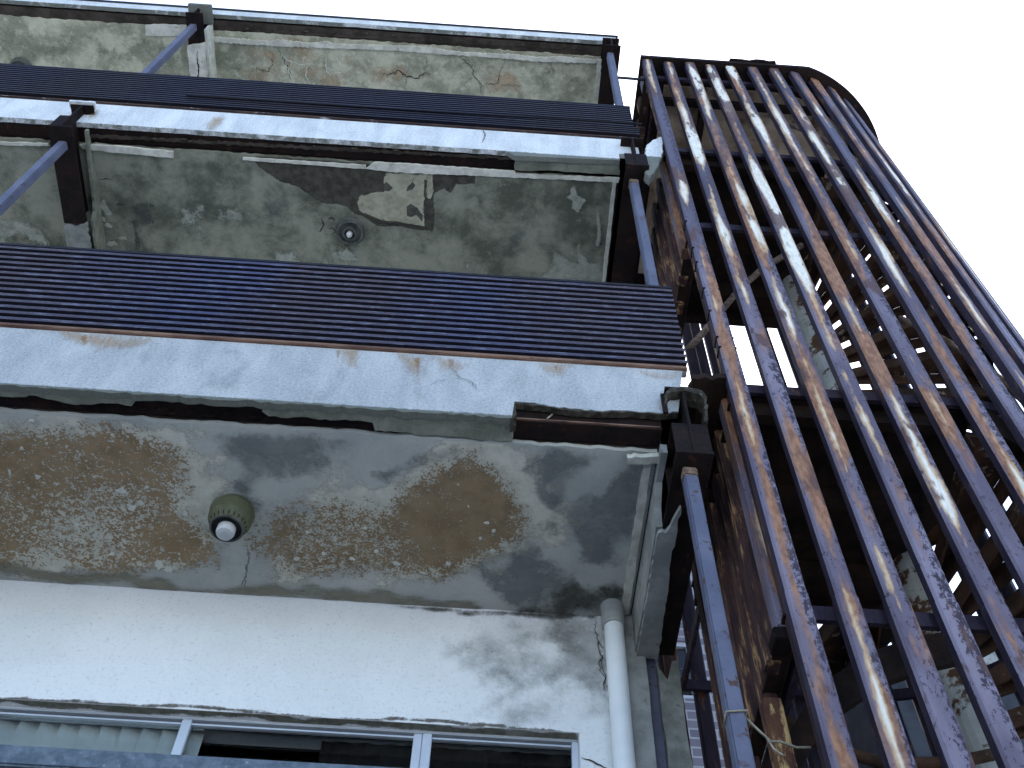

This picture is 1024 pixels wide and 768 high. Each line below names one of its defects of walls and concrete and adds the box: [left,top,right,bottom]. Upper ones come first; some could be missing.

crack [231,47,345,84]
crack [383,57,433,84]
crack [460,58,524,94]
flaking render [91,134,512,231]
damp [226,436,338,478]
damp [524,448,642,564]
damp [408,606,479,616]
damp [481,550,623,683]
crack [594,621,608,691]